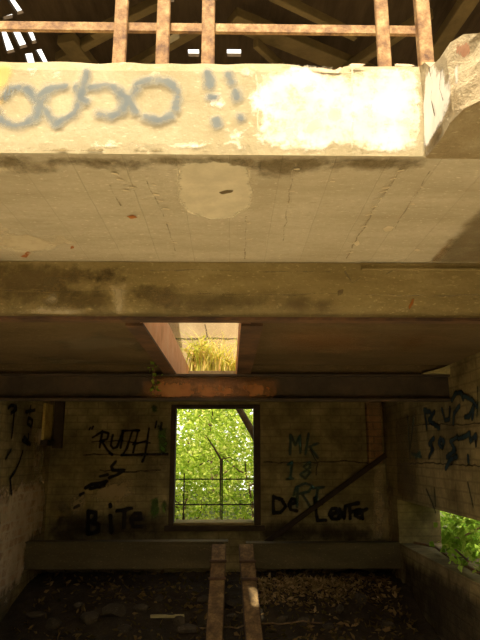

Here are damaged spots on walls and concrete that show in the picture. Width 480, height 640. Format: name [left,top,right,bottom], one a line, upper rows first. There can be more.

peeling [249,33,480,159]
water stain [232,159,321,174]
water stain [350,159,413,168]
water stain [0,267,105,309]
rust [150,376,272,398]